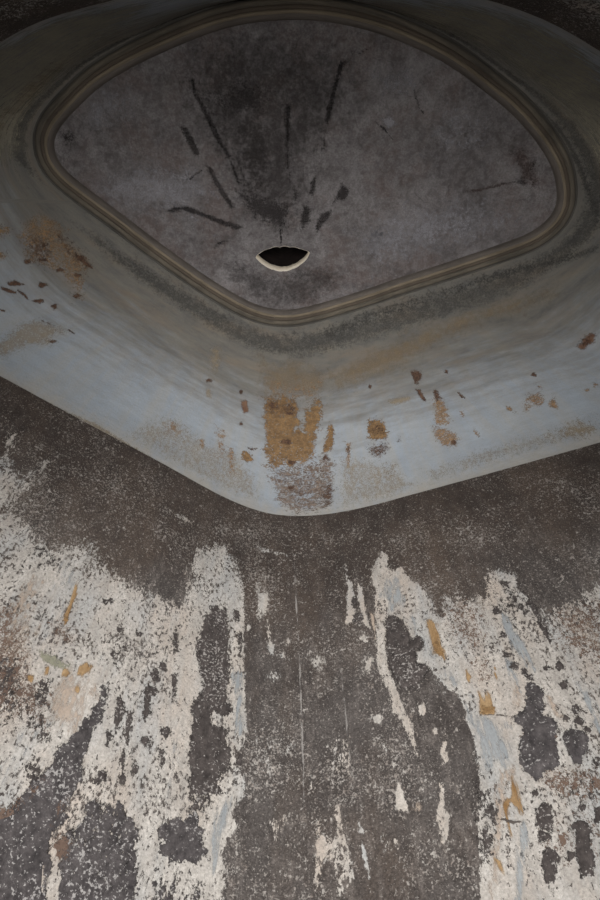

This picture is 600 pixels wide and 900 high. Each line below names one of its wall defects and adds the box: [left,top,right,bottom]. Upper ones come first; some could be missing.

rust [1,280,57,309]
rust [0,212,94,302]
rust [576,333,595,350]
rust [218,375,352,516]
rust [366,419,400,458]
rust [411,371,464,446]
rust [524,372,559,411]
peeling [0,427,298,900]
peeling [326,737,353,775]
peeling [344,551,600,900]